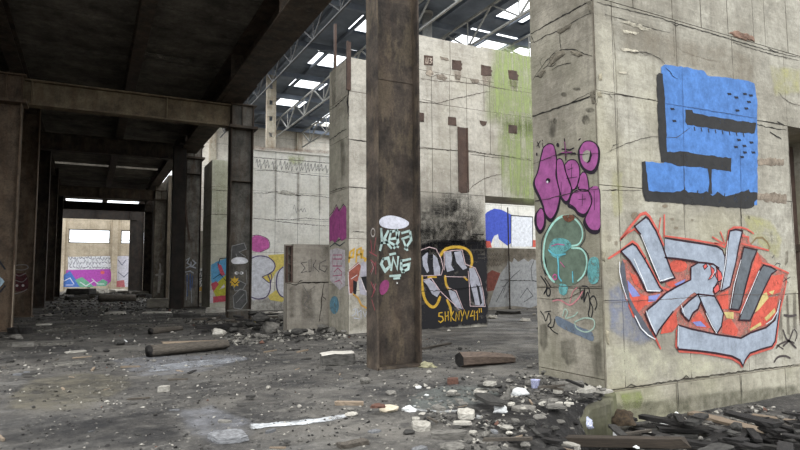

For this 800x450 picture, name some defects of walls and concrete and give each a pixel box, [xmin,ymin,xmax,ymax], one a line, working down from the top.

leakage [494,50,534,199]
crack [421,0,800,220]